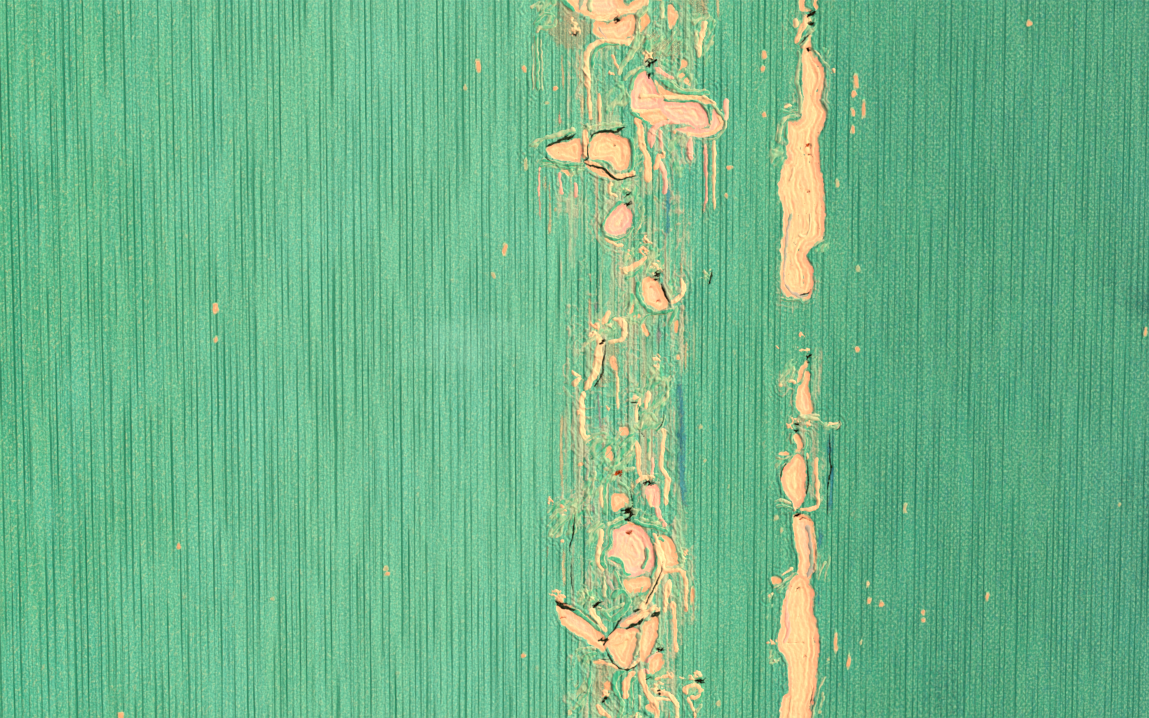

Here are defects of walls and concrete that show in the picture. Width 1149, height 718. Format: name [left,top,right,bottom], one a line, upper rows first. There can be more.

peeling [762,0,840,302]
peeling [521,0,733,718]
peeling [766,332,863,718]